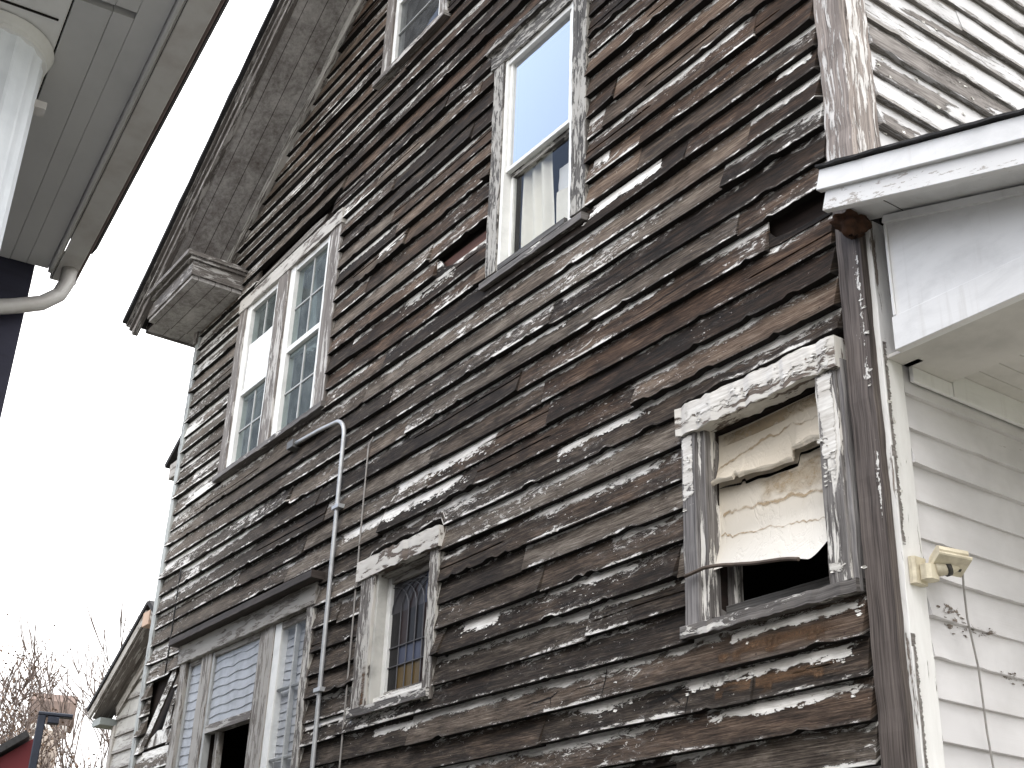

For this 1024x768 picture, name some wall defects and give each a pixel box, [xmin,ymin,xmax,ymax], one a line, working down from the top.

peeling [868,25,1018,115]
peeling [593,150,610,168]
peeling [582,159,662,226]
peeling [684,337,837,486]
peeling [338,430,501,546]
peeling [535,484,614,519]
peeling [536,410,650,493]
peeling [681,435,694,512]
peeling [829,562,846,573]
peeling [730,602,865,644]
peeling [686,639,862,696]
peeling [706,684,867,727]